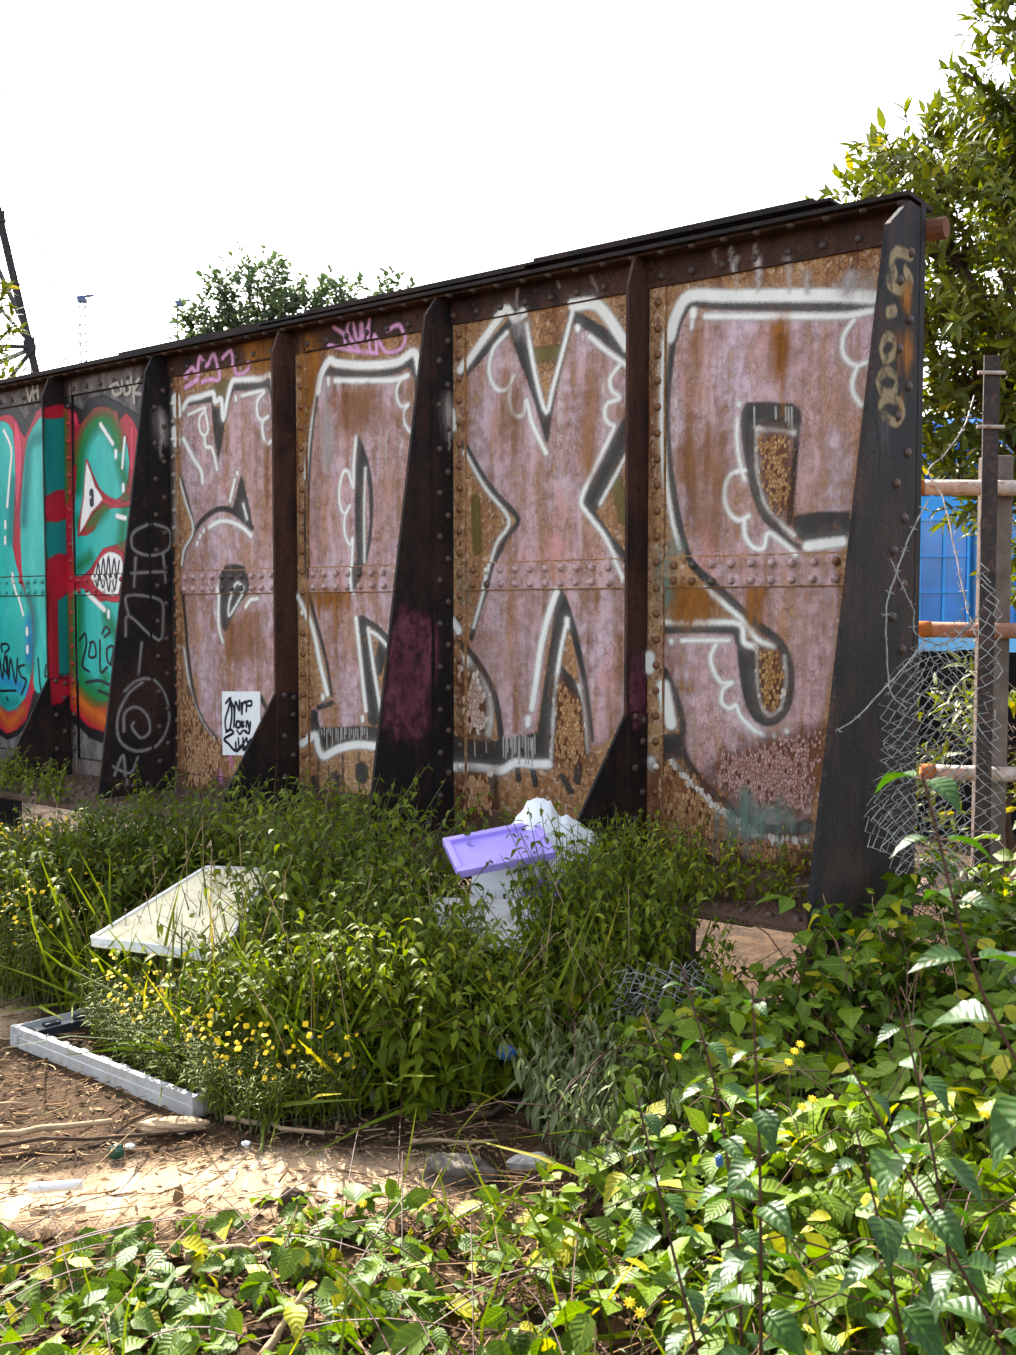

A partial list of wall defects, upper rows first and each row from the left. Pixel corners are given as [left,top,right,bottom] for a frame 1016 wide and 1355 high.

corrosion [243,338,271,374]
corrosion [774,323,788,374]
corrosion [298,337,319,444]
corrosion [310,591,349,628]
corrosion [670,586,709,626]